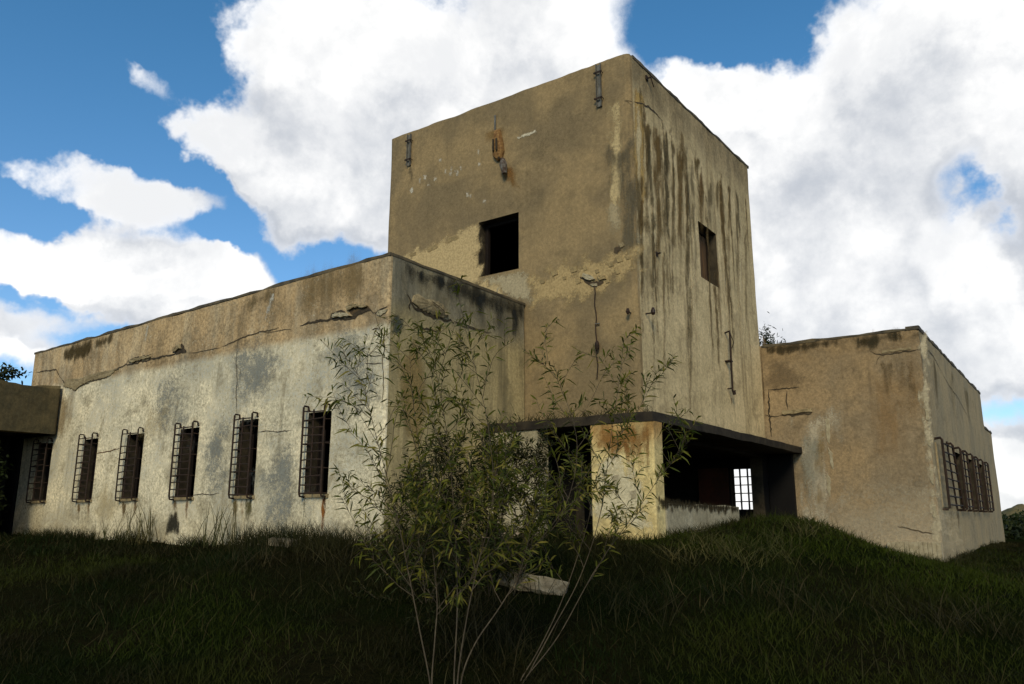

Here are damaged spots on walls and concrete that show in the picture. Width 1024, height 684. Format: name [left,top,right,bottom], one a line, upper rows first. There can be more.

damp [608,90,749,360]
flaking render [404,224,643,309]
damp [64,334,112,362]
crack [117,327,287,409]
crack [366,316,385,399]
damp [767,341,837,354]
damp [857,332,900,348]
crack [767,387,813,437]
corrosion [598,427,649,464]